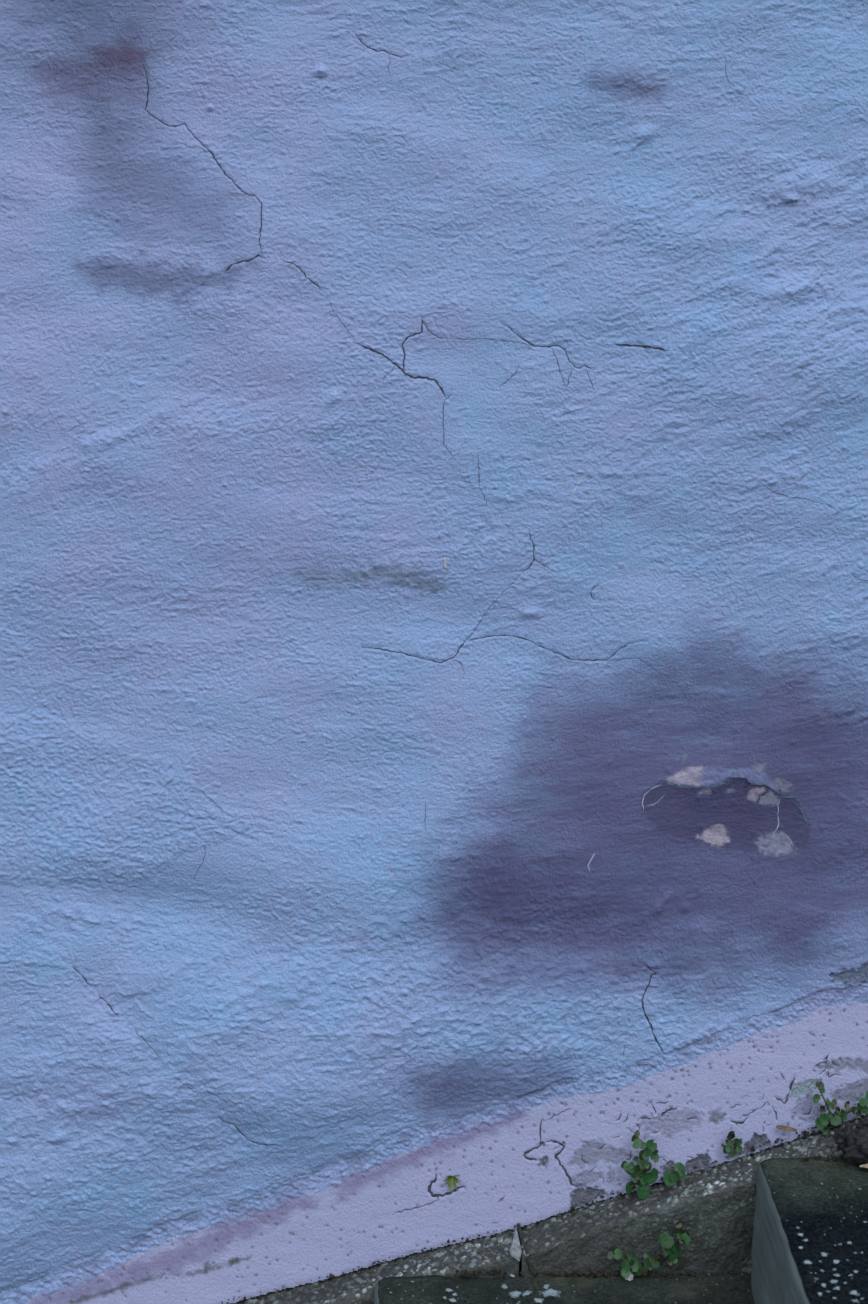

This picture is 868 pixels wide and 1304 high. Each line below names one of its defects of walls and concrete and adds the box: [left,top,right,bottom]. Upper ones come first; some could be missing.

crack [141,59,593,503]
crack [616,343,669,351]
peeling [642,754,808,860]